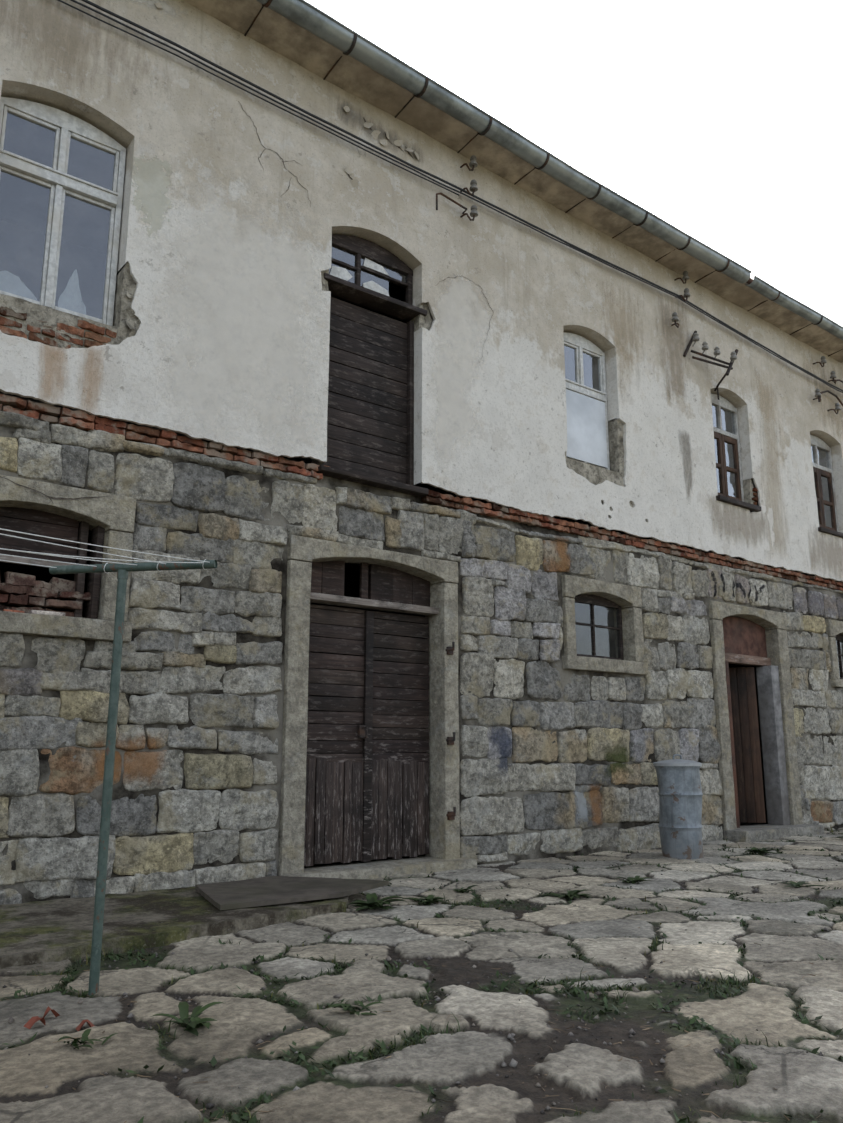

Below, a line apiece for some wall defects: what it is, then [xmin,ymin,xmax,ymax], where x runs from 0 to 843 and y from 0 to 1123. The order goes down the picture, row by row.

crack [238,101,311,207]
peeling [342,105,419,160]
spalling [0,262,140,349]
spalling [565,419,624,487]